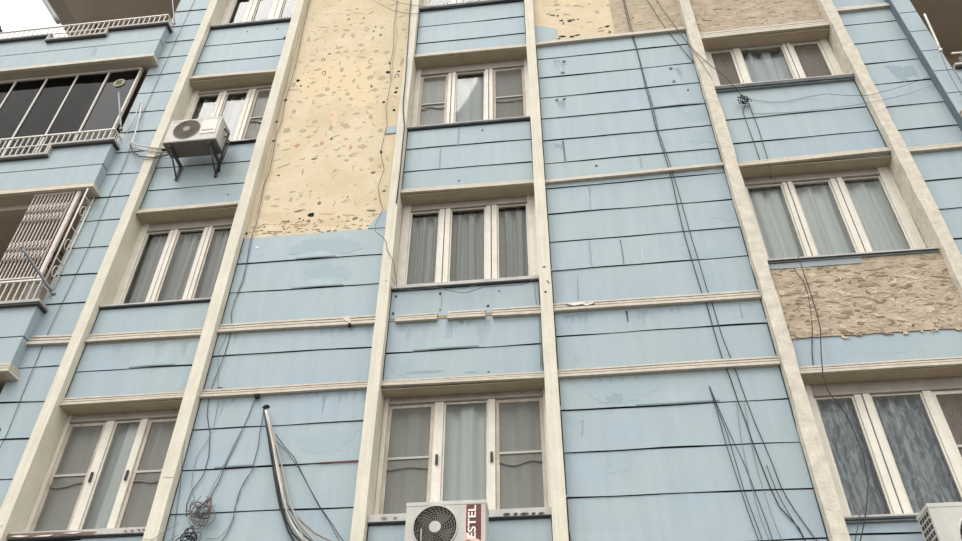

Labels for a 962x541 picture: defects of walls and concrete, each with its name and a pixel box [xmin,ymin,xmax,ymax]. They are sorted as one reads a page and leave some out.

spalling [533,0,824,43]
spalling [244,0,410,249]
spalling [768,252,962,339]